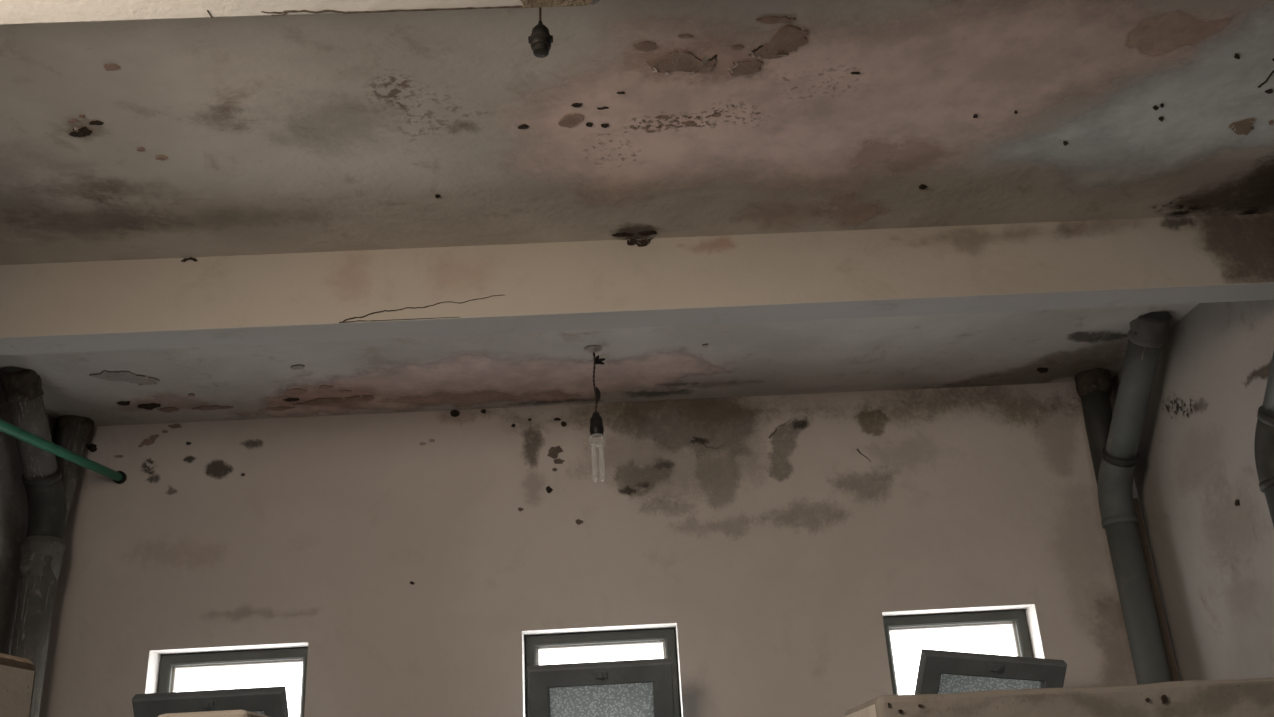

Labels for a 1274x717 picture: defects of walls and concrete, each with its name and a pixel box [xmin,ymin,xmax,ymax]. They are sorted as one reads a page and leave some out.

crack [261,5,523,16]
peeling [633,16,808,78]
flaking render [558,103,609,128]
peeling [630,105,760,133]
damp [1163,160,1274,279]
crack [339,295,505,323]
peeling [89,369,160,386]
peeling [117,393,234,448]
damp [252,353,754,494]
damp [142,459,158,482]
damp [184,442,245,479]
damp [768,419,807,480]